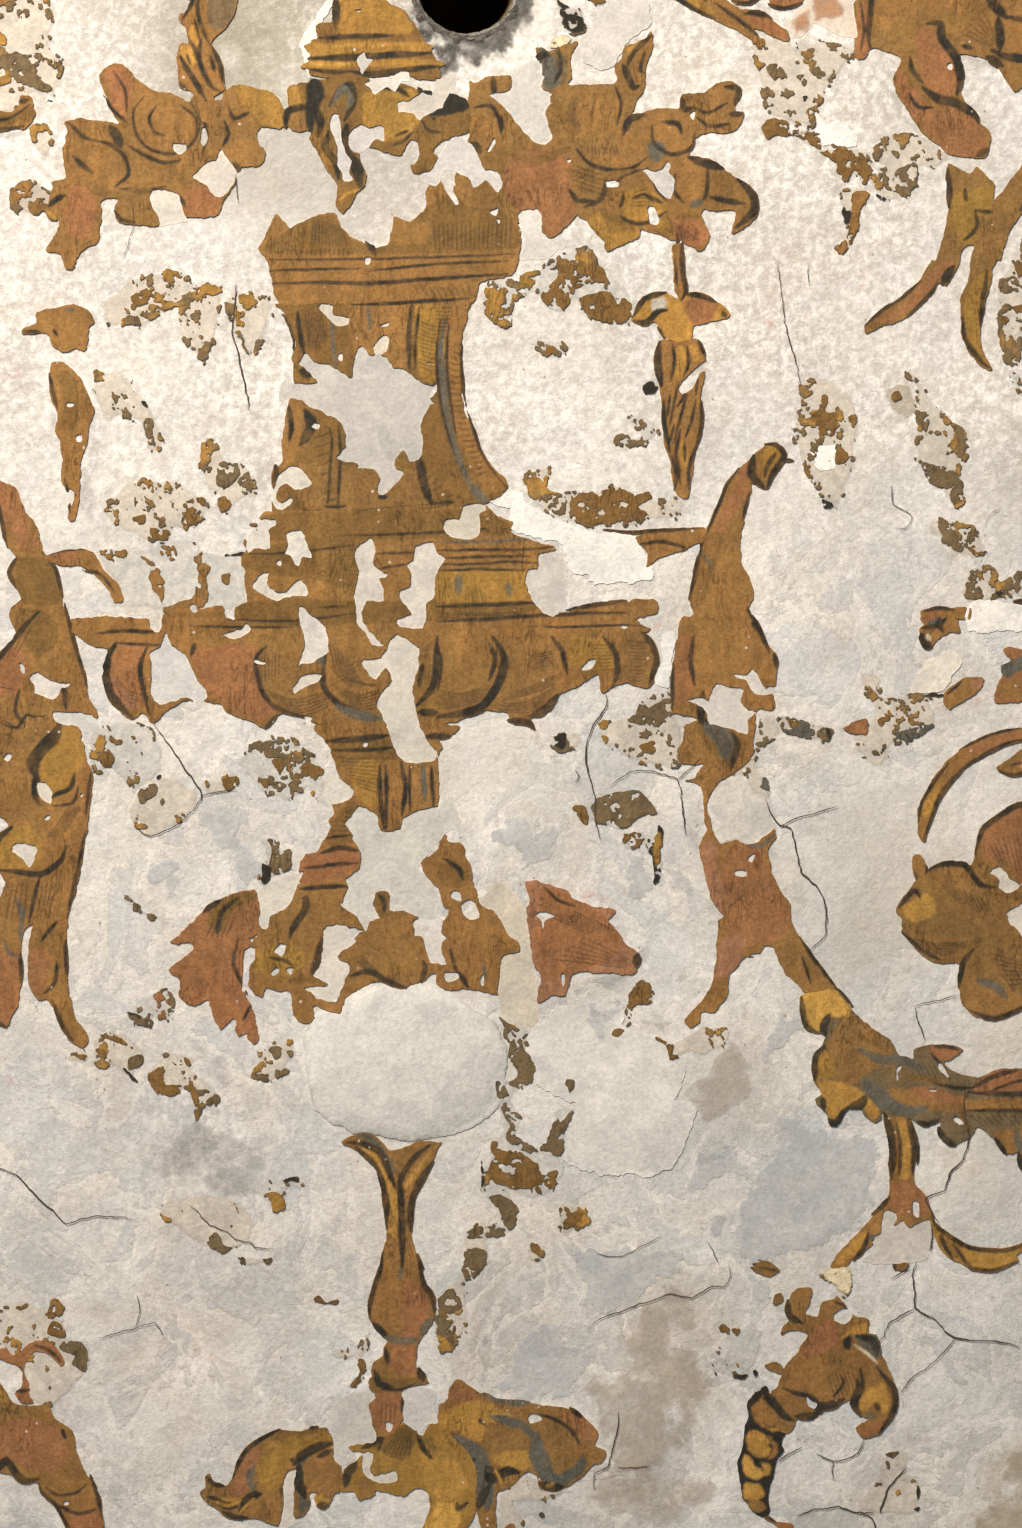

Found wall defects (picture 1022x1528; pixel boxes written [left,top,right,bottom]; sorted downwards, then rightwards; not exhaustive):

peeling [483,208,635,328]
peeling [279,335,434,495]
peeling [98,438,329,705]
peeling [353,503,486,763]
peeling [29,672,462,1001]
crack [575,693,700,838]
peeling [598,669,944,844]
crack [765,798,837,950]
crack [0,1168,133,1224]
crack [587,1241,731,1330]
crack [879,1101,1020,1394]
crack [778,1441,907,1528]